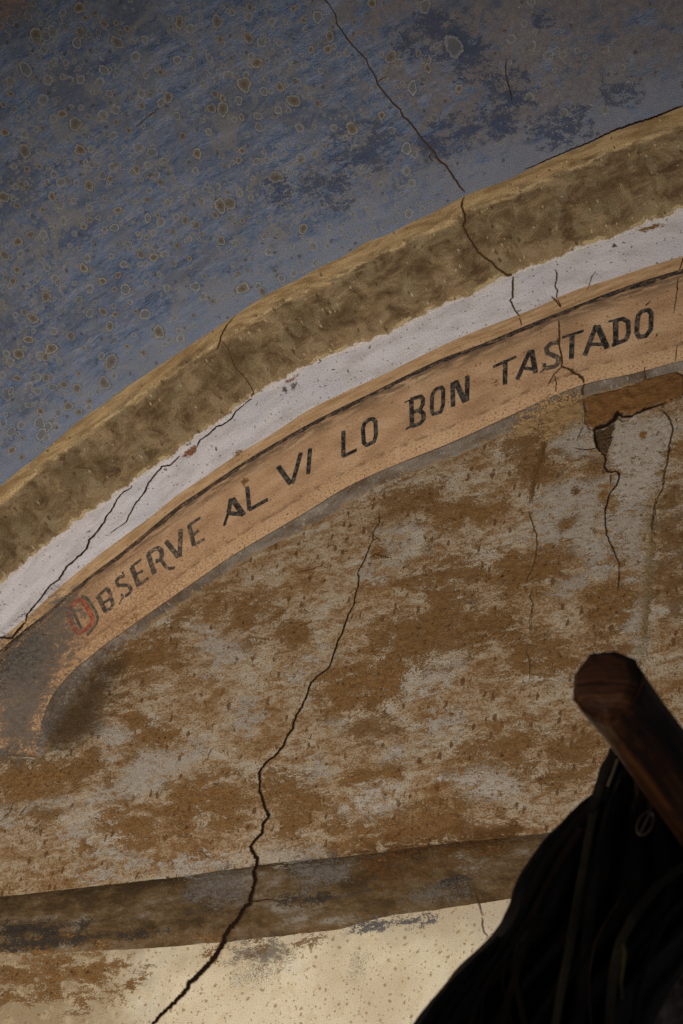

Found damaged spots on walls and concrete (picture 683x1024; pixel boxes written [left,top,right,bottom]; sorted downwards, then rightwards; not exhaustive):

damp [6,1,202,160]
damp [52,86,284,339]
damp [193,54,301,132]
crack [325,1,522,325]
damp [3,278,146,461]
crack [0,316,254,640]
flaking render [510,372,683,668]
crack [548,270,673,591]
crack [152,513,387,1024]